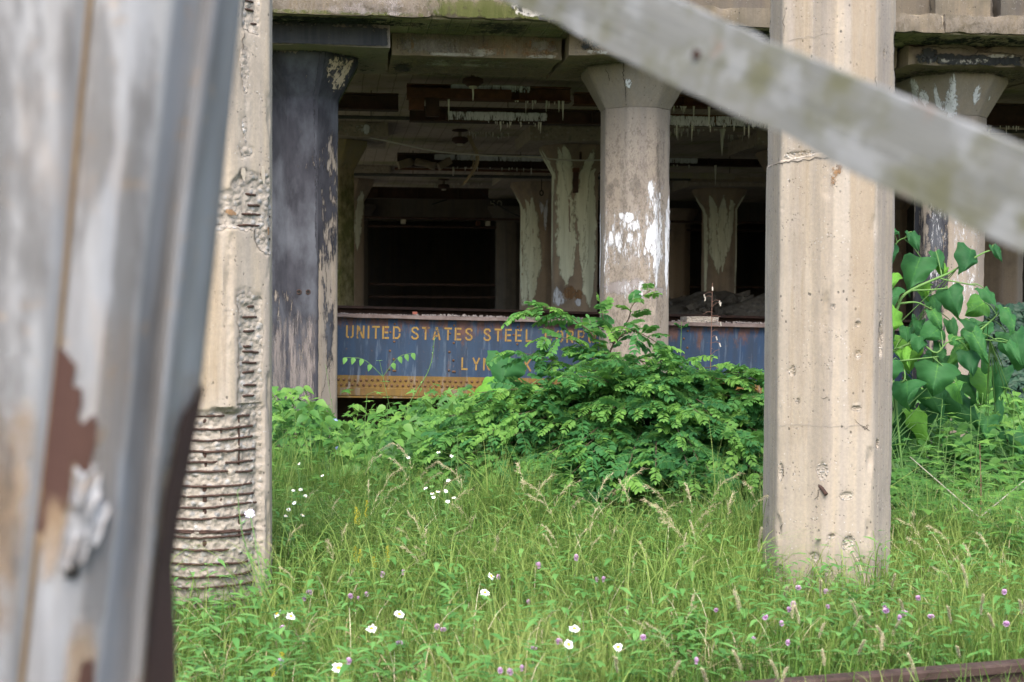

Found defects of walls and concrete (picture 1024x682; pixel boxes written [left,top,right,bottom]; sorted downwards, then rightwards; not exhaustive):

damp [449,111,547,121]
crack [771,157,825,166]
peeling [173,0,423,624]
spalling [827,534,856,551]